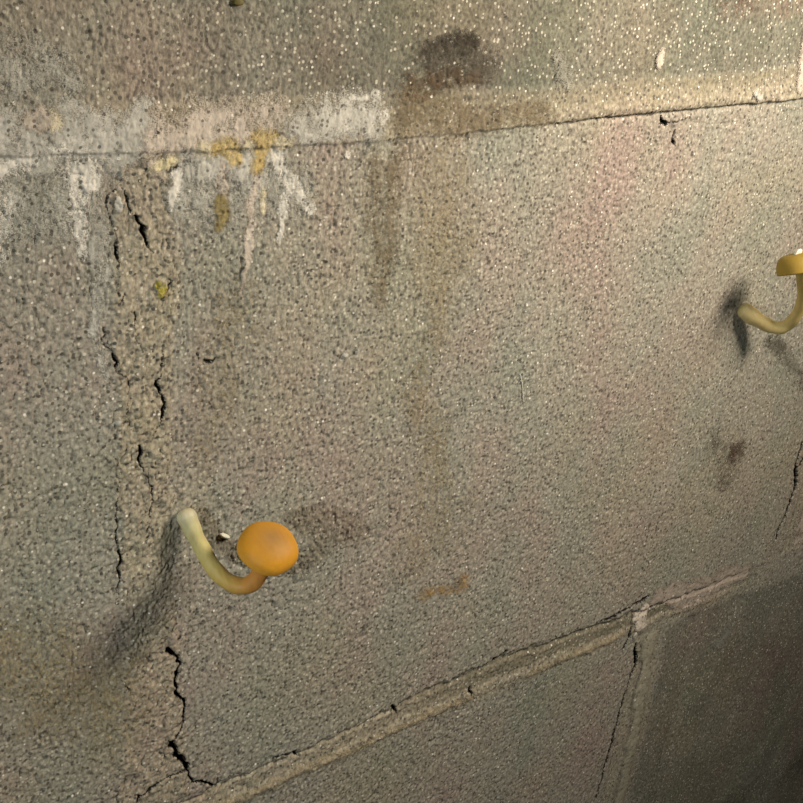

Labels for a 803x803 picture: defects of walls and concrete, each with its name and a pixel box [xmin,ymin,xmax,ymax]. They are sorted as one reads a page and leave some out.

crack [100,187,166,544]
water stain [0,24,558,603]
crack [105,458,123,652]
crack [775,441,803,539]
crack [116,647,239,803]
crack [595,595,650,798]